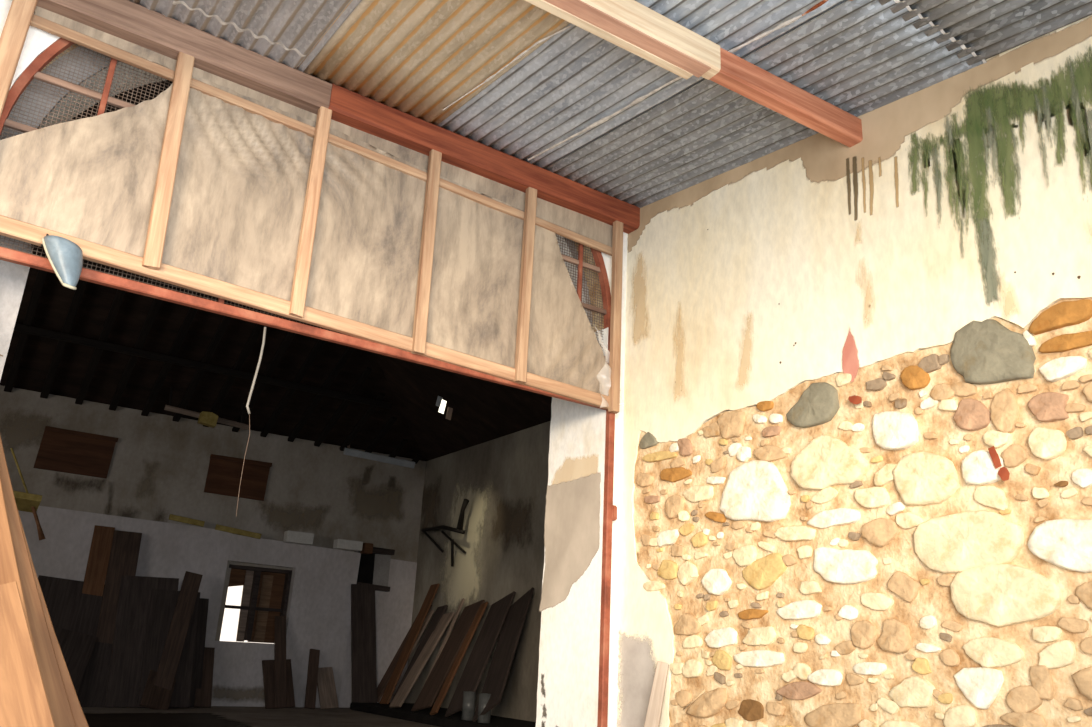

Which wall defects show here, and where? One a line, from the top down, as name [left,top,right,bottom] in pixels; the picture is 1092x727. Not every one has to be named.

rust [728,0,828,53]
rust [894,0,987,63]
rust [527,76,682,161]
peeling [628,16,1092,252]
leakage [846,157,899,220]
peeling [539,473,601,611]
spalling [633,298,1092,727]